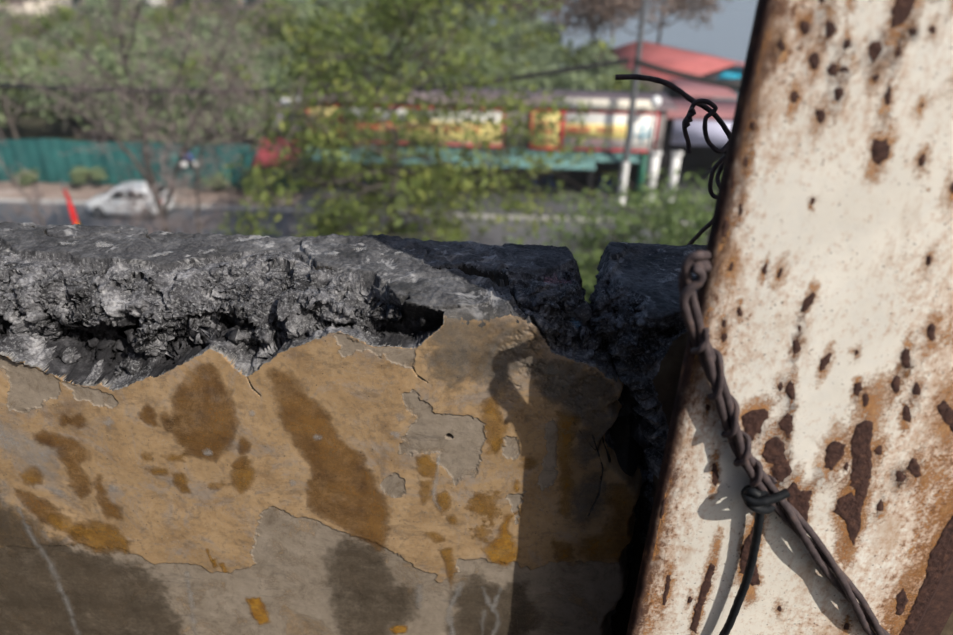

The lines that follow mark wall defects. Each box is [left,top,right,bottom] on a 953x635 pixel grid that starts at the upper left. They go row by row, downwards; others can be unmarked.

rust [762,0,938,182]
water stain [36,416,122,519]
water stain [0,471,180,635]
water stain [141,364,250,492]
spalling [0,222,496,413]
water stain [273,373,411,635]
peeling [398,389,486,486]
peeling [500,436,520,460]
spalling [508,260,687,479]
rust [687,527,724,635]
rust [739,283,953,569]
rust [881,382,953,635]